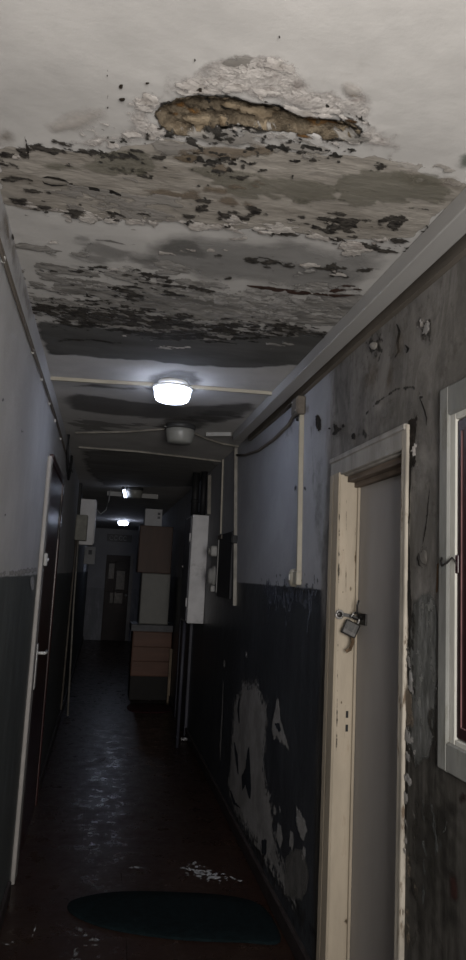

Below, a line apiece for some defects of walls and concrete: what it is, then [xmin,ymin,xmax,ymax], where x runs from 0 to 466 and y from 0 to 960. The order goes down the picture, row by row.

peeling [0,88,466,257]
water stain [370,156,466,187]
peeling [15,243,363,347]
water stain [30,199,409,368]
water stain [71,385,250,422]
peeling [219,673,309,909]